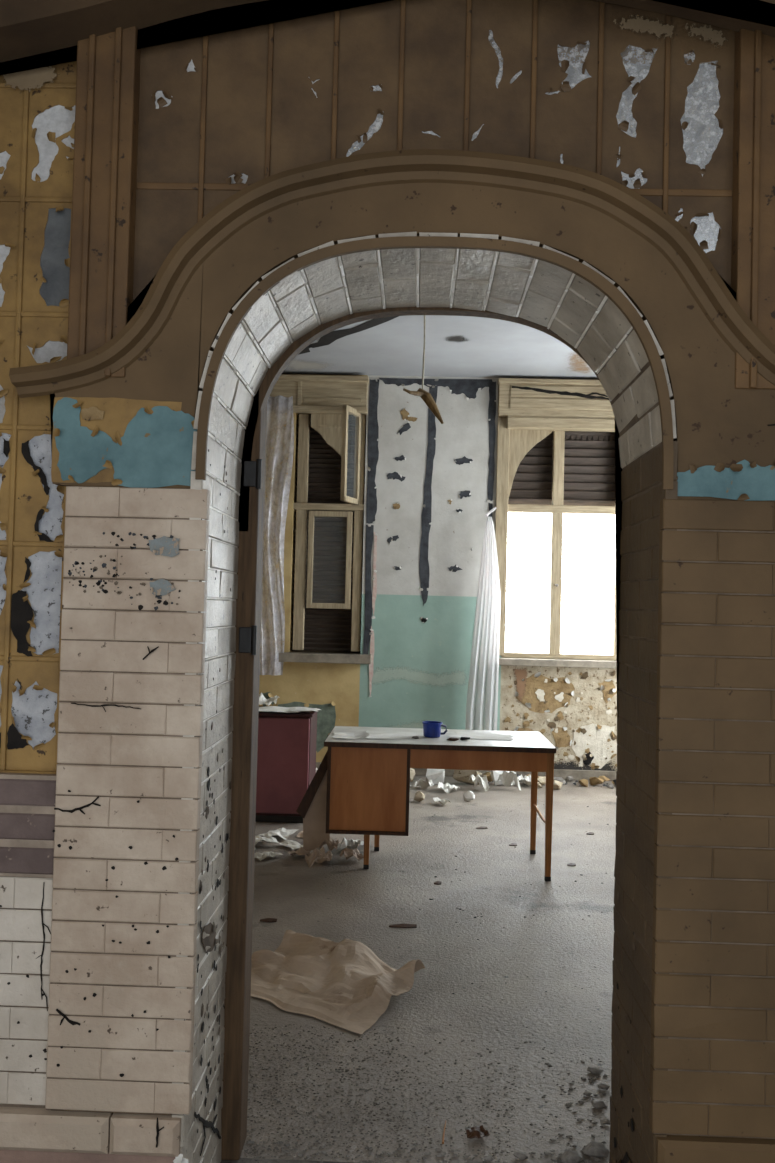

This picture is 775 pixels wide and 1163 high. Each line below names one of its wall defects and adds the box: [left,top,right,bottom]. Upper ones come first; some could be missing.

peeling [548,41,588,93]
peeling [627,76,642,95]
peeling [31,105,75,182]
peeling [0,243,16,307]
peeling [673,460,775,501]
peeling [0,385,197,657]
peeling [0,665,57,750]
spalling [504,671,617,770]
crack [36,882,80,1026]